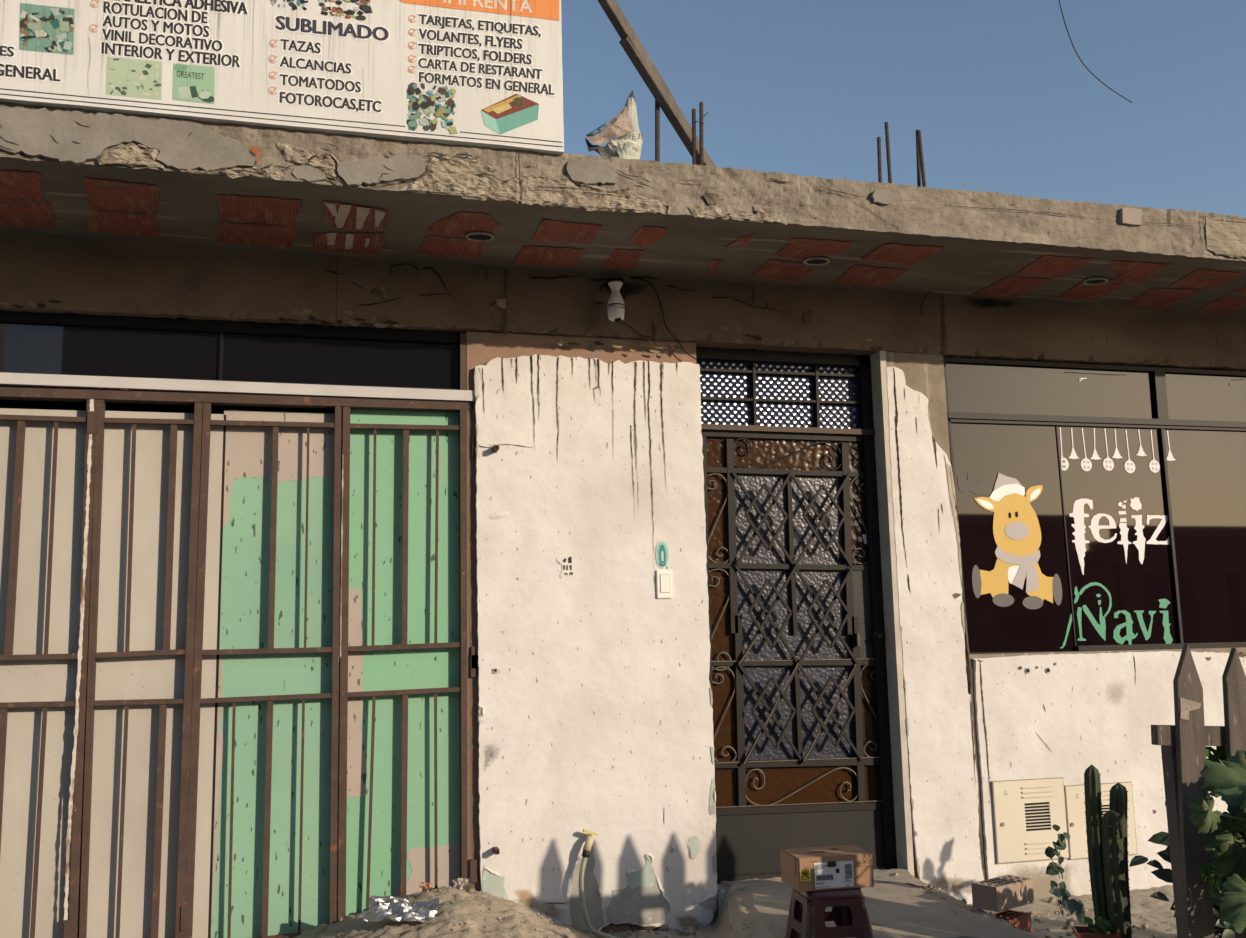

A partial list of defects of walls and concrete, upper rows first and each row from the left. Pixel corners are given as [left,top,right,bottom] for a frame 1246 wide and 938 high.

spalling [96,142,341,181]
water stain [502,355,540,437]
water stain [556,357,573,455]
water stain [588,358,614,398]
water stain [630,361,678,532]
peeling [482,866,509,900]
peeling [569,847,672,931]
peeling [667,836,717,876]